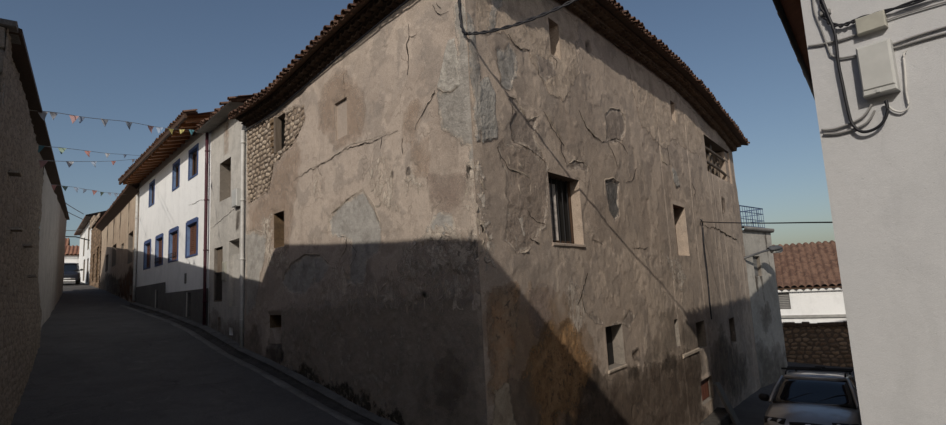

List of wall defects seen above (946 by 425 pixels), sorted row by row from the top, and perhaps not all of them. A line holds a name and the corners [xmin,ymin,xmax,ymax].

flaking render [246,105,305,264]
crack [294,93,435,181]
peeling [487,34,557,255]
crack [579,111,637,183]
spalling [604,177,619,220]
peeling [605,107,625,143]
spalling [523,290,594,425]
water stain [565,327,709,425]